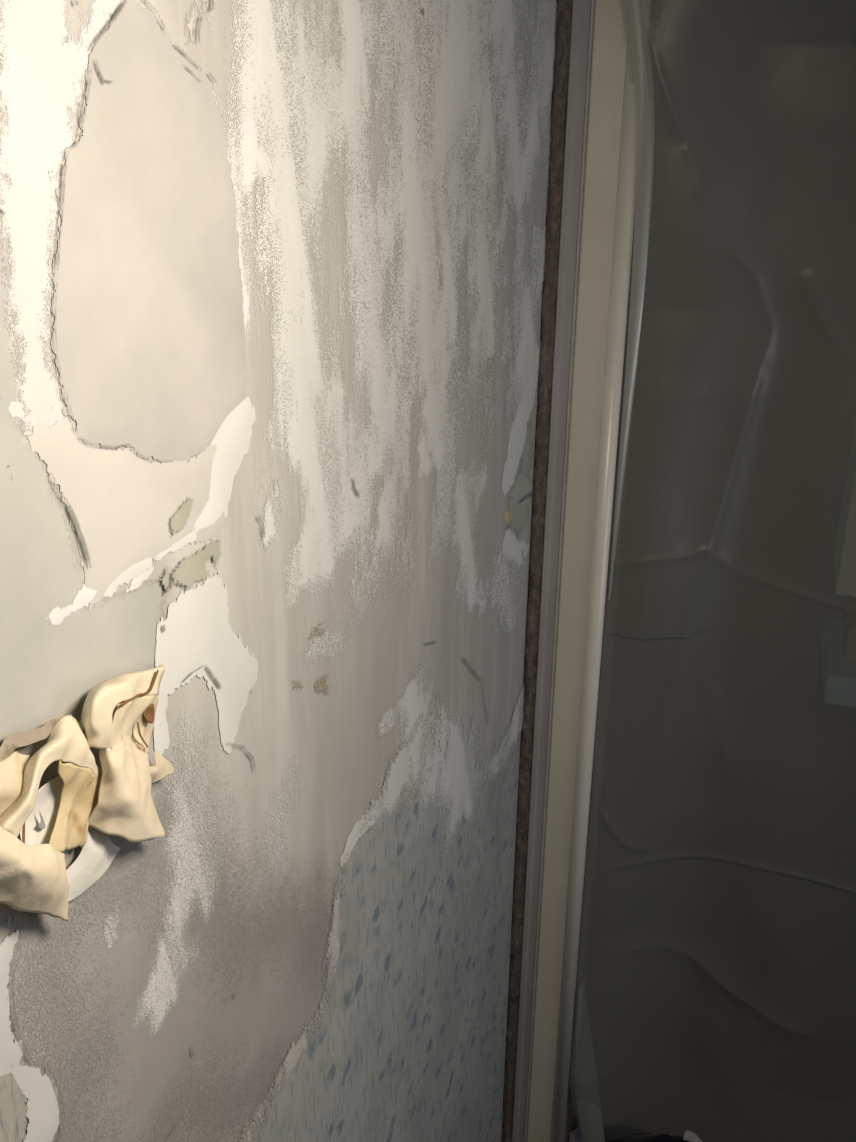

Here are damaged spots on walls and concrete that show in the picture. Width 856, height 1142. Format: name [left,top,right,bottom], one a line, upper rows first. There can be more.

crack [55,0,216,369]
peeling [0,137,342,1142]